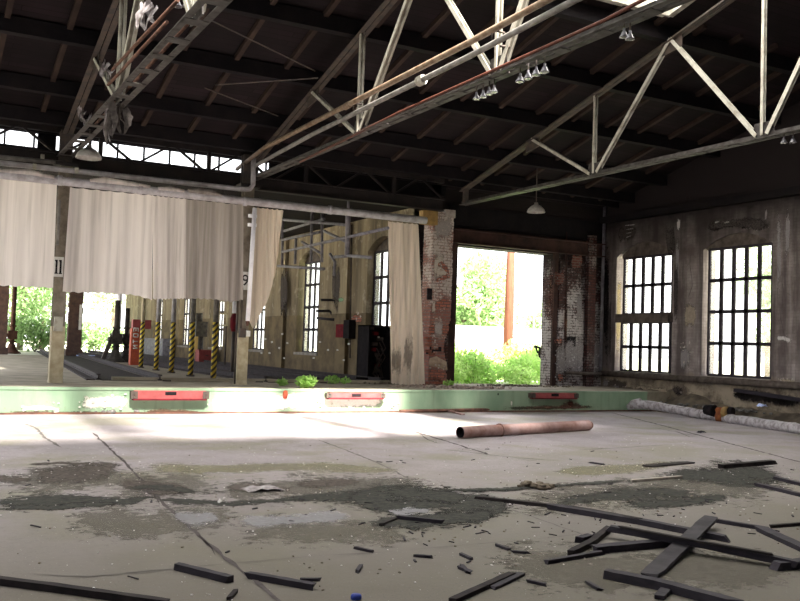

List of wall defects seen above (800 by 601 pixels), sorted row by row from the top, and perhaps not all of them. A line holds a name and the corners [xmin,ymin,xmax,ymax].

peeling [424,299,450,355]
crack [26,424,60,447]
crack [93,433,392,601]
water stain [0,459,791,549]
crack [25,568,174,580]
water stain [490,541,658,596]
water stain [659,550,791,593]